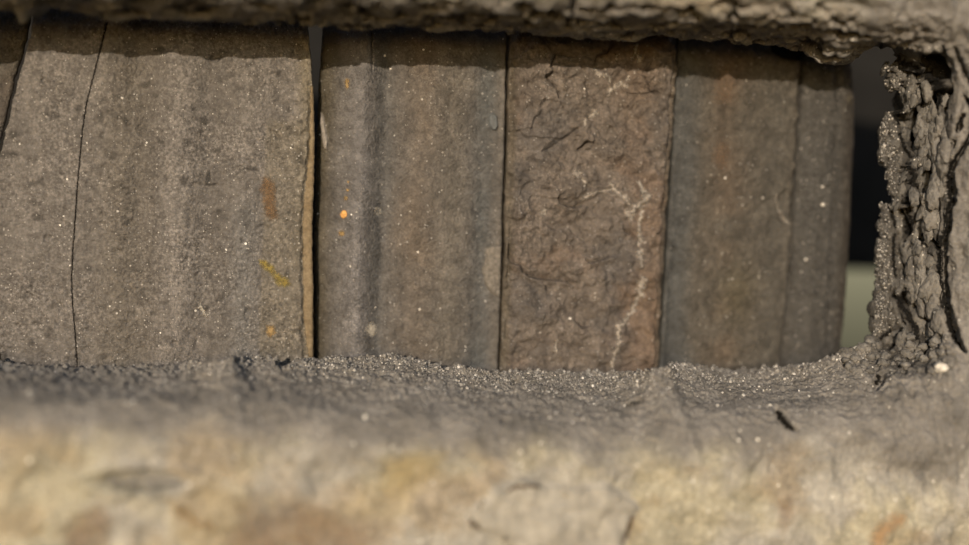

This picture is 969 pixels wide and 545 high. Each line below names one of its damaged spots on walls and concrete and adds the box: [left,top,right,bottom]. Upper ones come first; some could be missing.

crack [71,22,108,360]